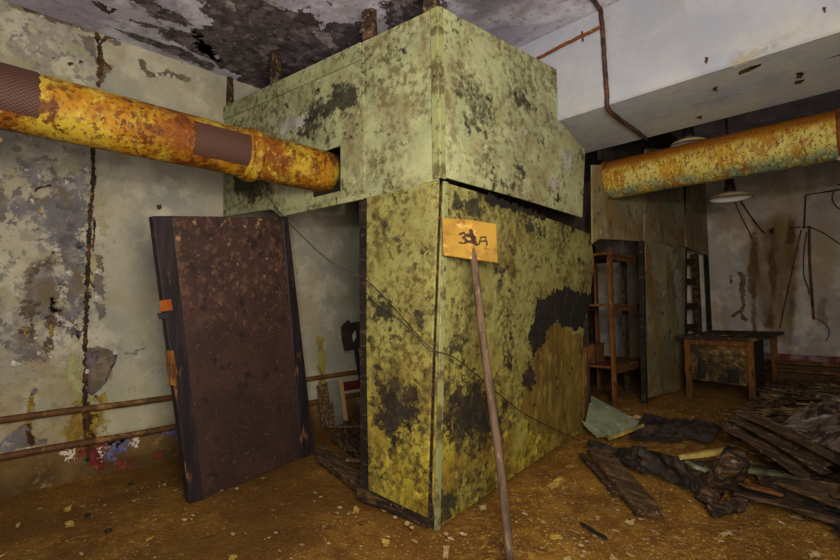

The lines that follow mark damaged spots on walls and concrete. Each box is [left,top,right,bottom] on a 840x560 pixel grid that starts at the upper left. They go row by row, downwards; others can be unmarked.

flaking render [8,2,113,83]
peeling [92,0,117,15]
peeling [107,0,362,89]
peeling [0,159,110,342]
peeling [0,318,55,372]
flaking render [84,346,144,396]